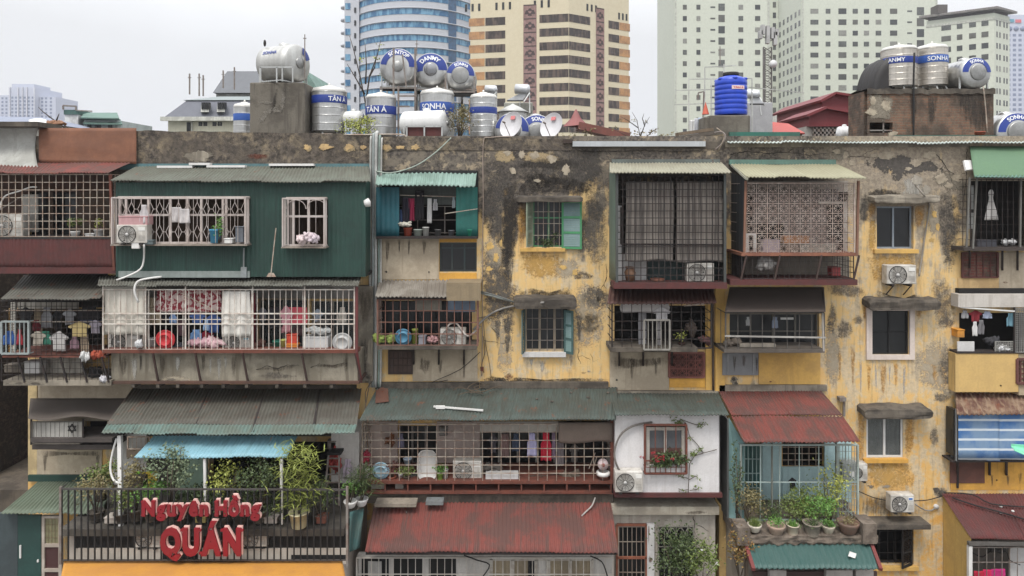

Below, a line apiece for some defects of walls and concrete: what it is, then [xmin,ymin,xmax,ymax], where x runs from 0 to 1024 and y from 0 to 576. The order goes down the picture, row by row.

spalling [494,150,570,175]
spalling [831,147,964,198]
damp [480,149,607,350]
damp [939,195,960,265]
damp [828,307,861,337]
damp [831,285,862,297]
damp [933,283,953,327]
damp [935,353,949,401]